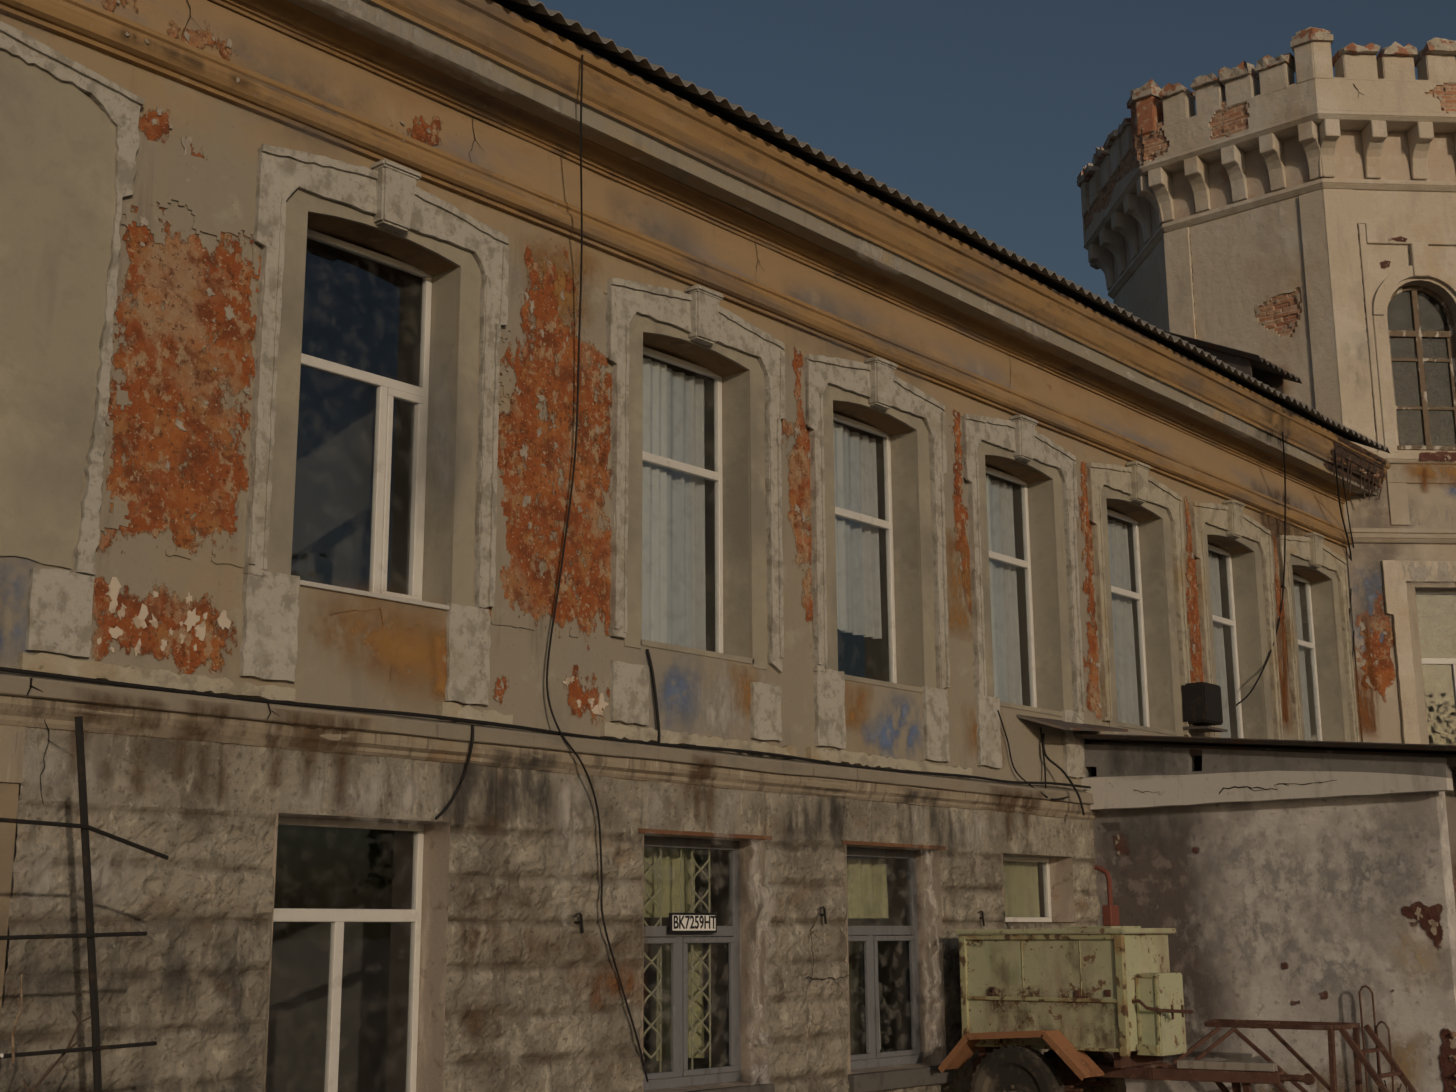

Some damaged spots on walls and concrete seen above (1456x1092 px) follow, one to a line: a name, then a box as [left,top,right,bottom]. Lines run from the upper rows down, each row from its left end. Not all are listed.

peeling [96,204,261,556]
peeling [487,244,612,649]
peeling [781,348,813,624]
peeling [949,410,972,616]
peeling [92,576,238,675]
peeling [562,664,610,724]
peeling [1077,462,1102,720]
corrosion [1355,619,1375,732]
damp [271,714,418,814]
damp [559,782,582,870]
spalling [1401,866,1456,949]
spalling [1438,1028,1456,1092]